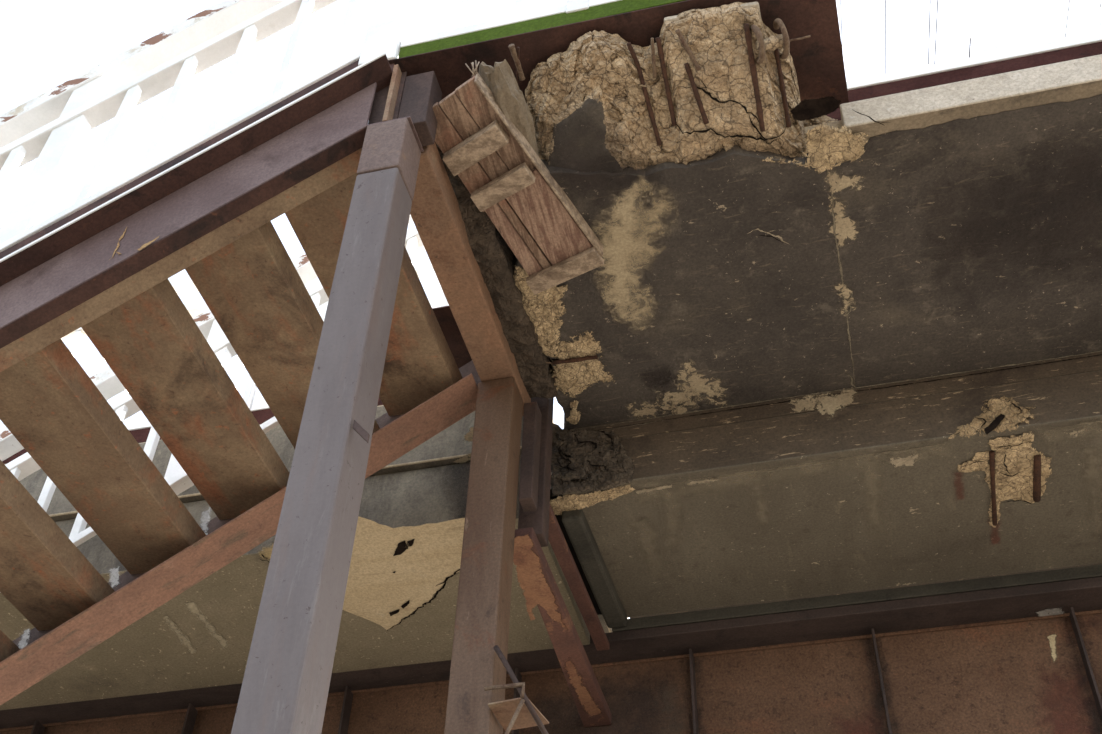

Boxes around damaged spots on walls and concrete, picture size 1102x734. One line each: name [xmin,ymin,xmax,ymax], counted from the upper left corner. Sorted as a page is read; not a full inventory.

crack [677,82,786,144]
spalling [508,1,869,330]
spalling [435,142,672,515]
peeling [625,362,728,420]
peeling [789,387,857,418]
spalling [949,396,1052,528]
peeling [342,516,465,630]
corrosion [513,534,568,631]
corrosion [564,657,601,716]